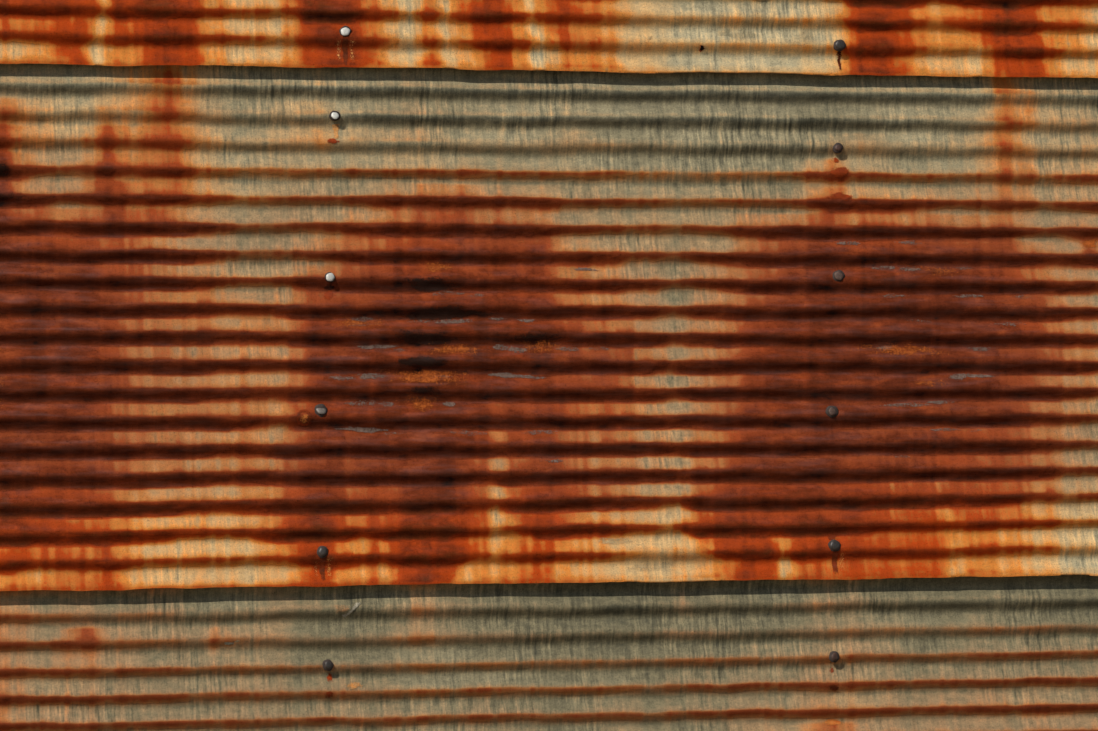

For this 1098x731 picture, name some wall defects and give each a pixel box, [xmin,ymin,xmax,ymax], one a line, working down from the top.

rust [829,192,853,202]
rust [403,369,451,383]
rust [279,528,642,587]
rust [671,524,1073,581]
rust [0,610,1098,731]